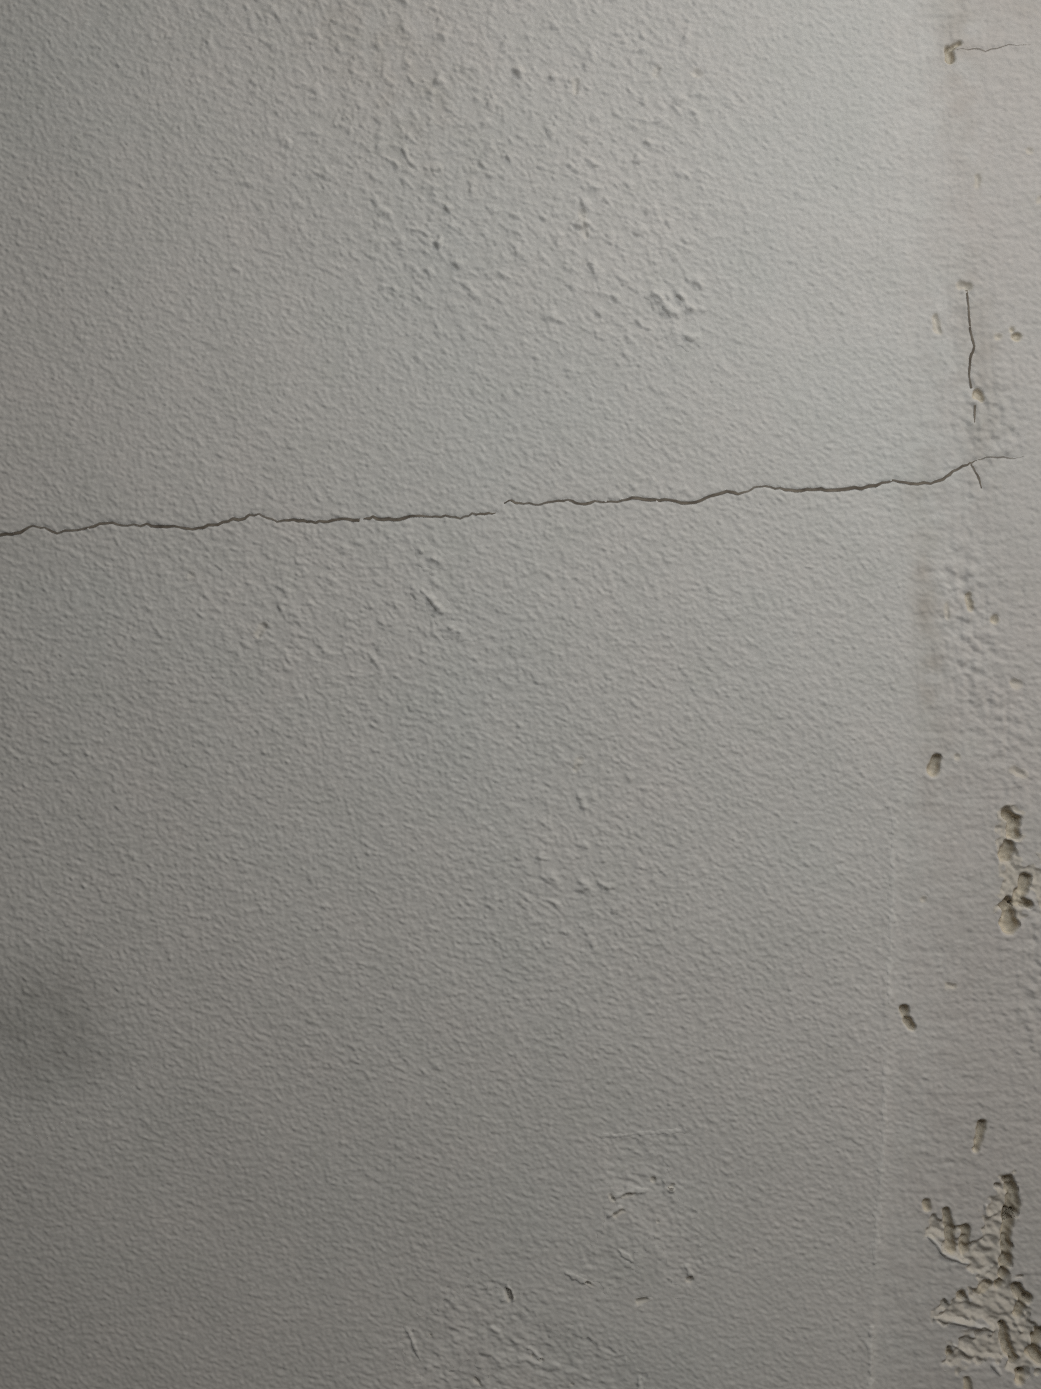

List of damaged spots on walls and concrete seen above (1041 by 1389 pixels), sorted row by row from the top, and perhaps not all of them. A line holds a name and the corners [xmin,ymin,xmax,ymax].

crack [966,290,976,422]
crack [0,457,1008,536]
flaking render [993,804,1041,936]
flaking render [921,1170,1041,1389]